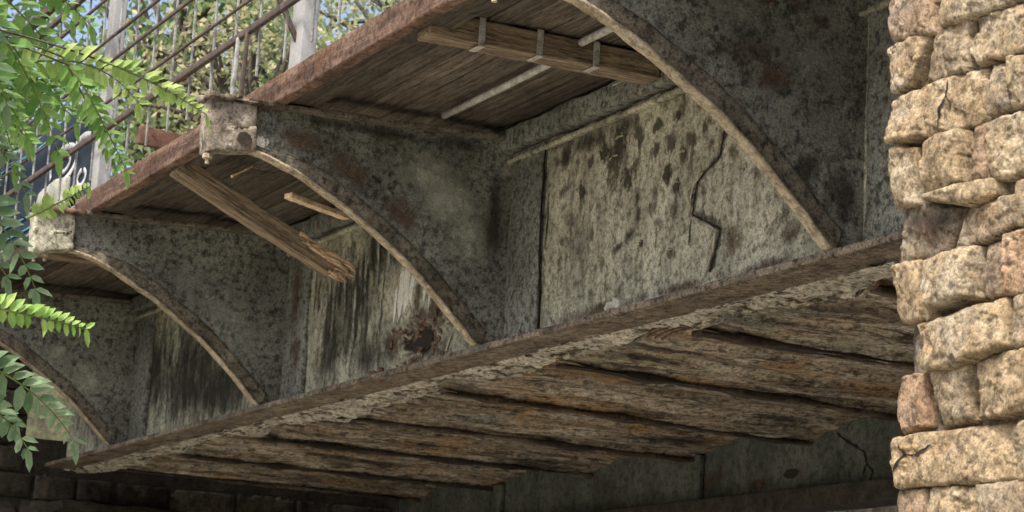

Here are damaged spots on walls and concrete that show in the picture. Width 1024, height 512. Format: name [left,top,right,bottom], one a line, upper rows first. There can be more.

crack [937,80,951,129]
leakage [556,130,619,166]
leakage [613,192,640,252]
crack [688,125,727,272]
leakage [310,237,440,374]
rust [409,283,442,332]
leakage [149,327,242,415]
crack [836,433,931,480]